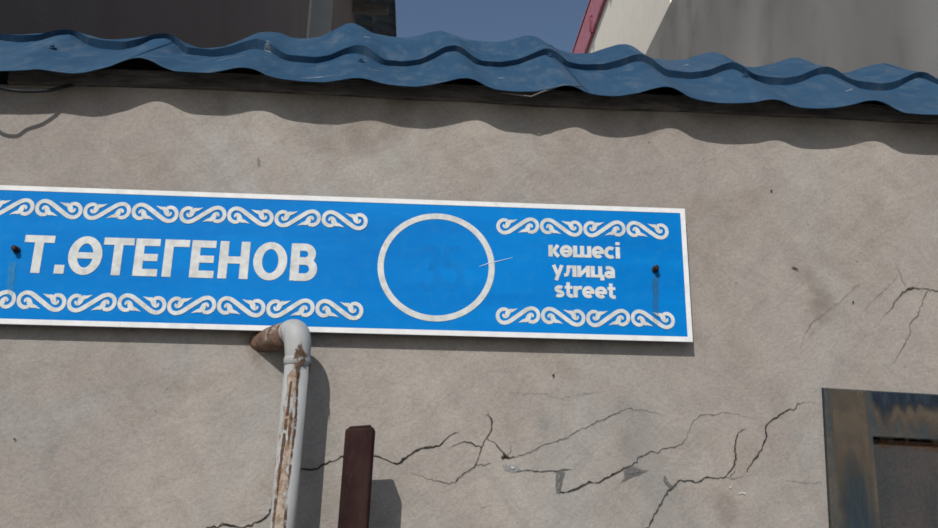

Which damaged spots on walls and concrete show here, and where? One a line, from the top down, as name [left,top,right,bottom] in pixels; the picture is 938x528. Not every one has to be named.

crack [894,287,938,337]
corrosion [272,344,311,528]
crack [300,455,343,471]
crack [374,410,684,493]
crack [647,403,799,528]
crack [206,502,272,528]